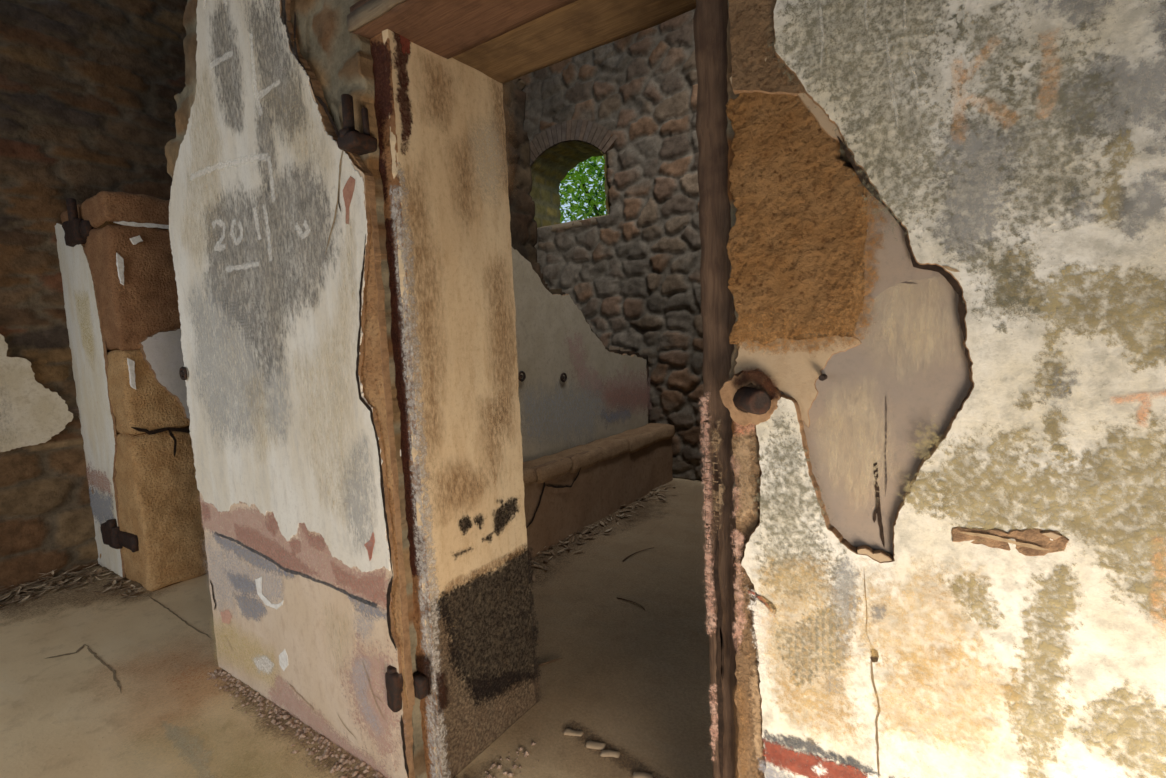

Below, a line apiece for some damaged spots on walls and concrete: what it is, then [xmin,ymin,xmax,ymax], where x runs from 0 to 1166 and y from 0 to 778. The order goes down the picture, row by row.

spalling [116,253,124,285]
spalling [726,76,971,562]
spalling [127,328,190,422]
crack [131,427,190,457]
peeling [86,464,113,524]
crack [526,468,581,528]
crack [873,400,887,548]
spalling [951,527,1069,556]
crack [864,574,880,778]